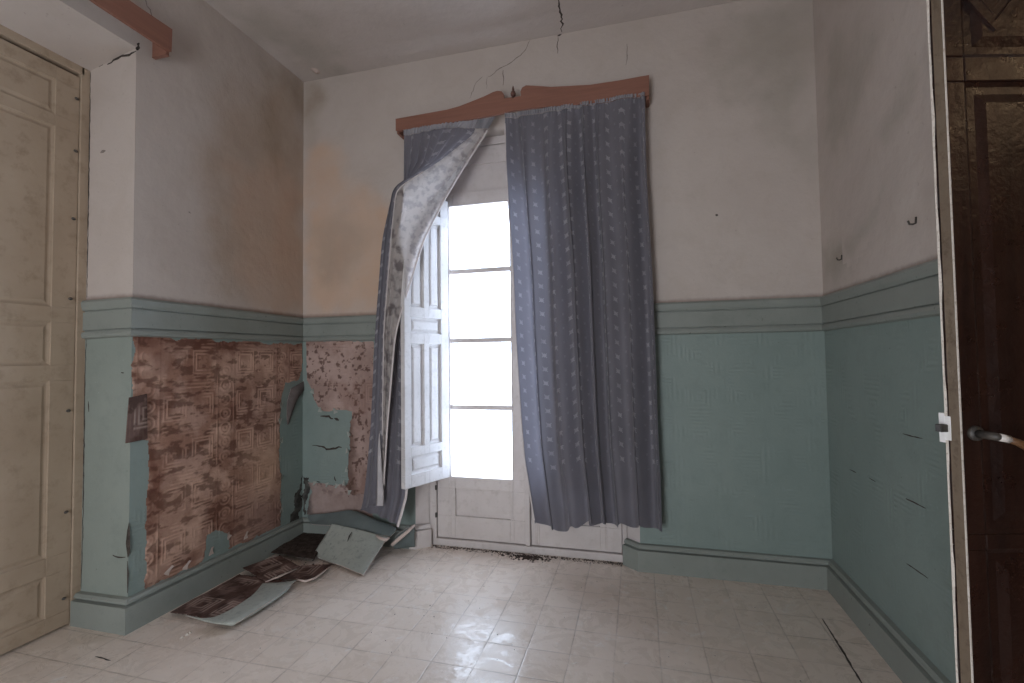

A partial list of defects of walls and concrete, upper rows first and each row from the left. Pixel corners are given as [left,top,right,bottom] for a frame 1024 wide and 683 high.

crack [556,0,564,53]
crack [87,43,140,278]
crack [80,339,88,582]
peeling [131,337,374,589]
crack [822,619,862,683]